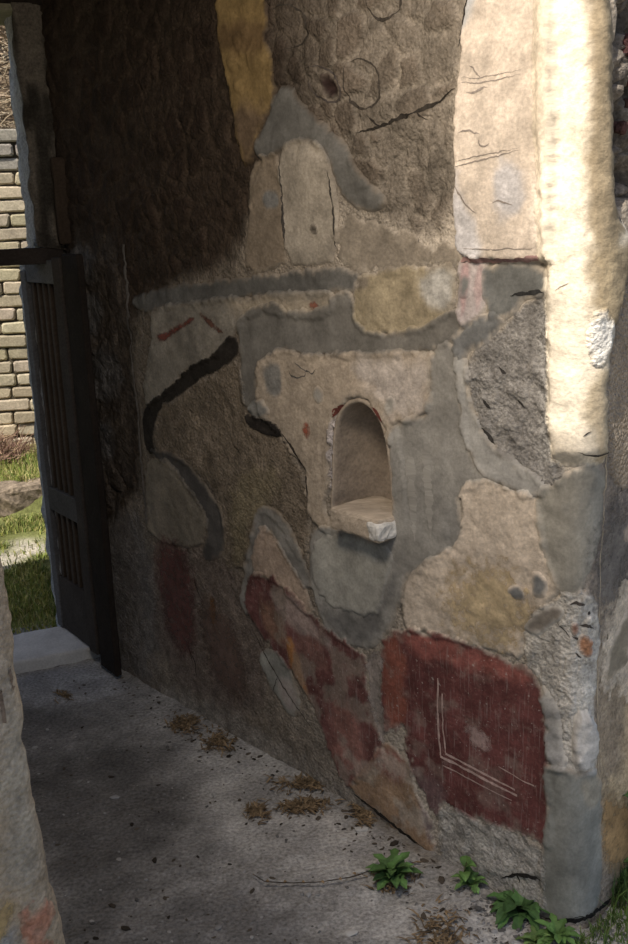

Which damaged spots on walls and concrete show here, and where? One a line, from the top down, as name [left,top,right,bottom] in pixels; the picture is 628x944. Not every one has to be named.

crack [365,0,402,22]
crack [307,58,455,133]
spalling [468,291,565,486]
spalling [507,571,628,772]
crack [502,873,542,882]
crack [541,891,617,924]